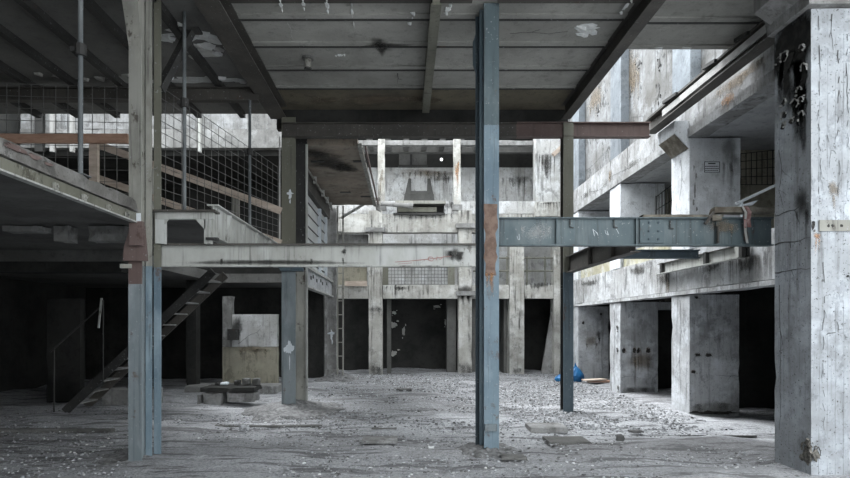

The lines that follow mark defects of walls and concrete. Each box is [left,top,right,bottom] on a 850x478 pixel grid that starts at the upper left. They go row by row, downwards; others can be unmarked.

flaking render [161,22,182,43]
flaking render [575,23,600,38]
flaking render [187,31,225,60]
spalling [774,43,806,66]
hole [779,86,805,130]
leakage [535,155,555,175]
rust [483,204,498,286]